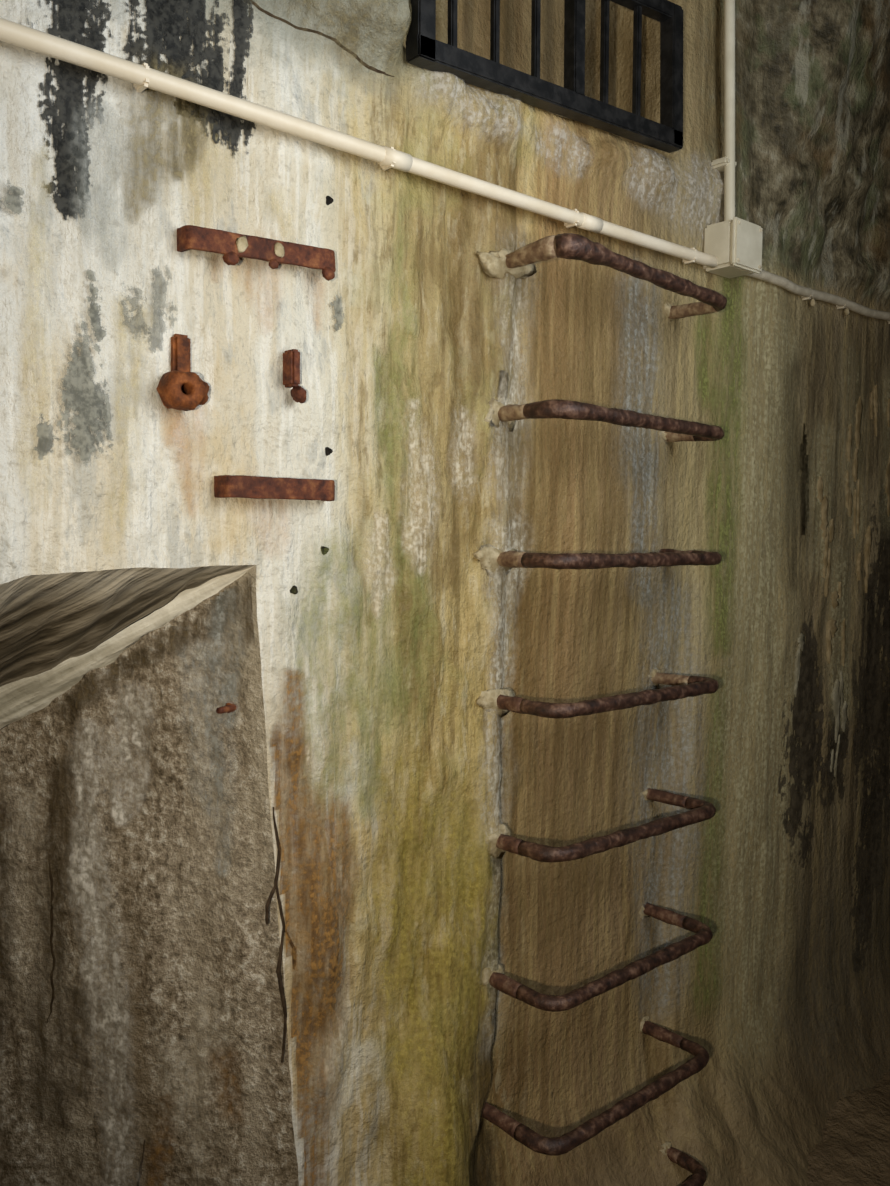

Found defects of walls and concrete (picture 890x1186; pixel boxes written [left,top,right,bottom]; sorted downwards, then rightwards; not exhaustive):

leakage [28,0,114,52]
leakage [123,0,254,99]
leakage [39,57,108,220]
leakage [130,88,256,214]
corrosion [222,251,240,265]
corrosion [322,267,335,281]
leakage [329,295,344,331]
leakage [498,275,528,405]
leakage [405,401,435,574]
leakage [368,514,394,616]
crack [265,807,296,1063]
corrosion [271,671,350,1186]